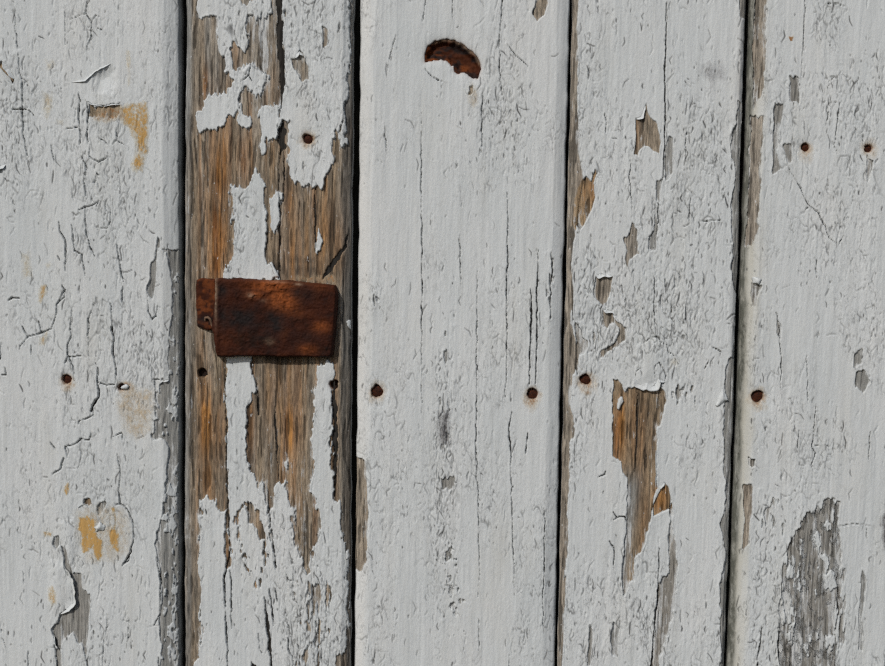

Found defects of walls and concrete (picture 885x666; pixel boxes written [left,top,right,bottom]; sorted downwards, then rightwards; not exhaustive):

peeling [75,64,122,119]
peeling [623,105,673,267]
crack [56,327,117,472]
peeling [147,0,368,666]
peeling [52,536,90,666]
peeling [78,498,107,532]
peeling [612,378,693,666]
peeling [715,318,735,666]
peeling [742,484,753,549]
peeling [762,497,784,527]
peeling [772,498,846,666]